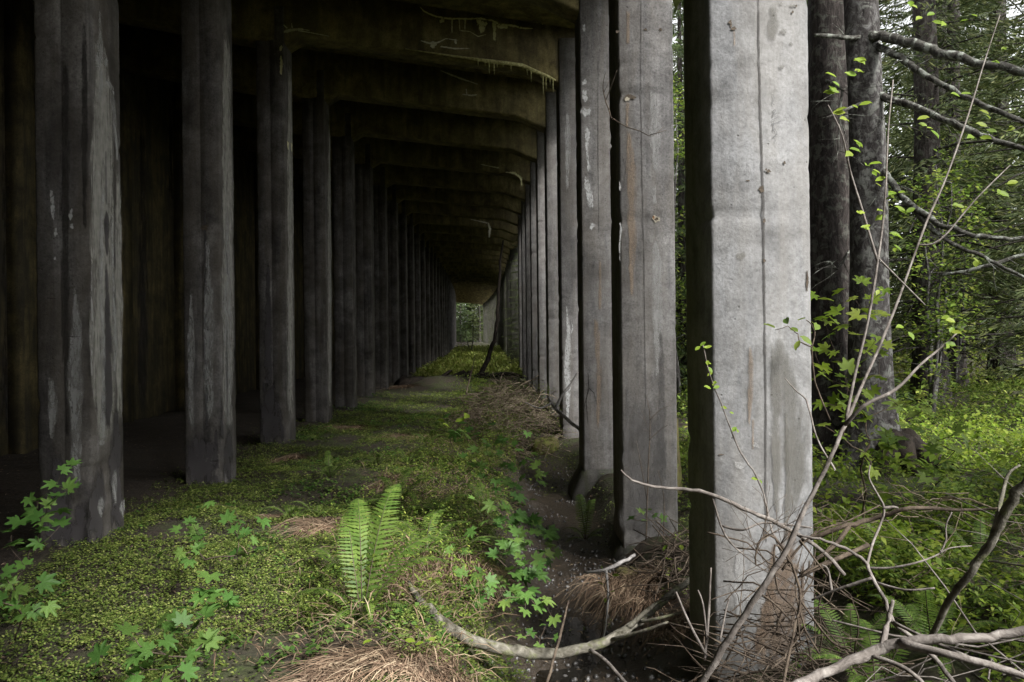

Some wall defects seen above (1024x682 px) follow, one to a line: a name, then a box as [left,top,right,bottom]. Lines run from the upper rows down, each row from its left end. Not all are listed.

water stain [405,38,556,86]
water stain [581,80,593,207]
water stain [769,348,804,538]